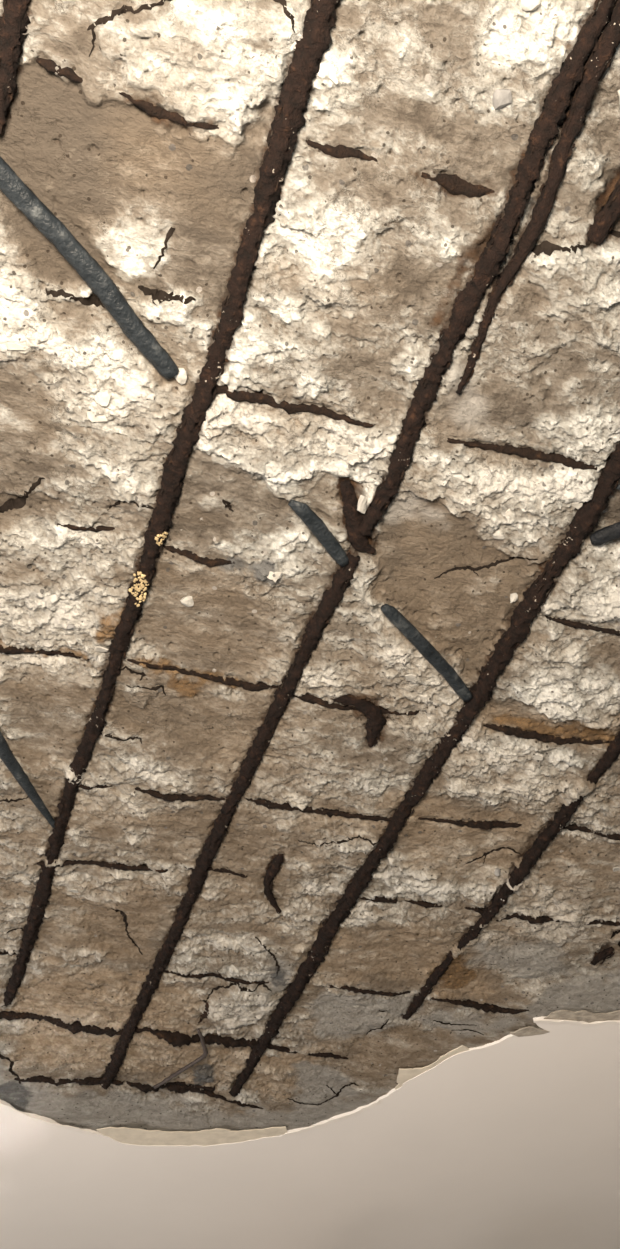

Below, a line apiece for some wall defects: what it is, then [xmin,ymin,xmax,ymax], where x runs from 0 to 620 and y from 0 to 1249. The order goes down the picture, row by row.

crack [87,0,172,57]
spalling [17,0,197,117]
spalling [0,63,274,319]
rust [448,222,499,292]
spalling [369,44,620,690]
rust [96,612,122,642]
crack [120,666,166,695]
rust [139,657,238,697]
rust [494,714,615,744]
spalling [391,795,537,886]
crack [433,1020,484,1035]
crack [0,1054,21,1084]